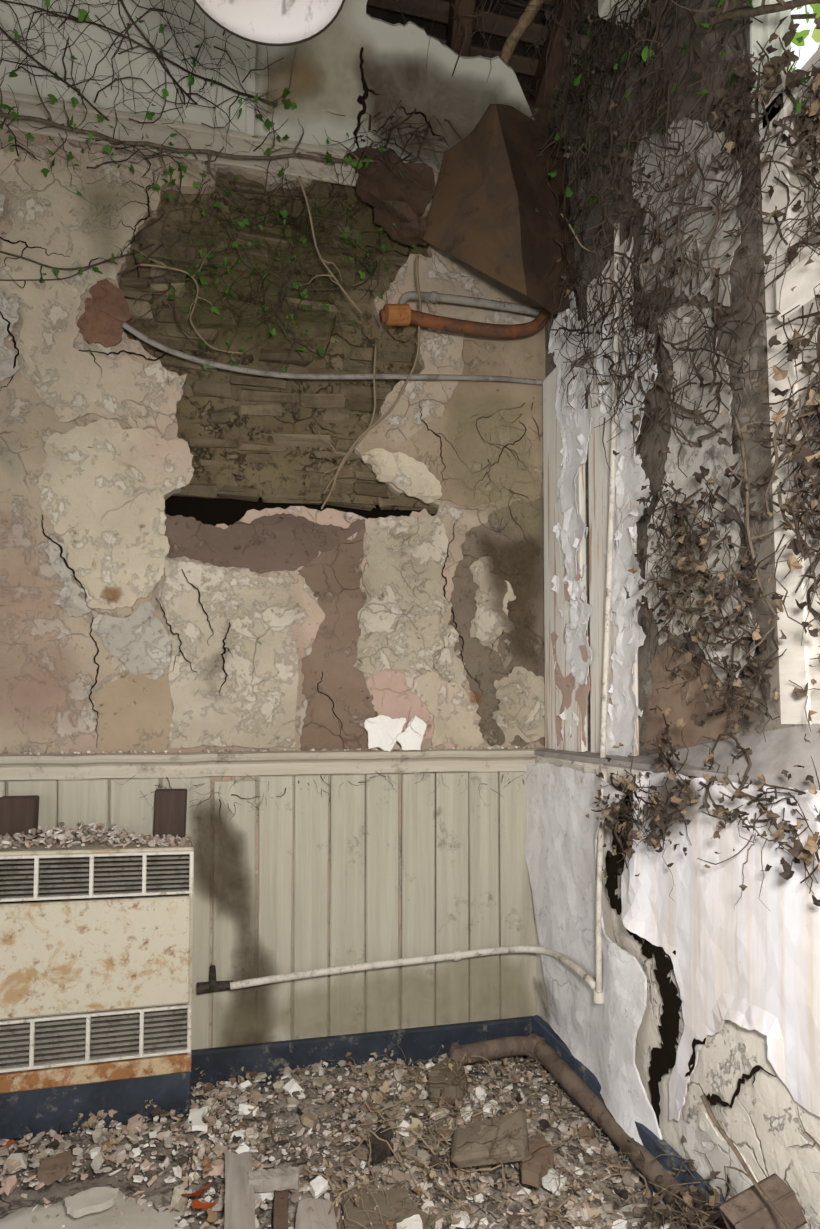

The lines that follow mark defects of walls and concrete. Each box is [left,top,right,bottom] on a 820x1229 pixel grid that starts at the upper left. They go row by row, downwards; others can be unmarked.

peeling [0,149,164,184]
peeling [0,289,21,382]
flaking render [70,116,760,757]
crack [41,514,100,738]
peeling [45,530,172,680]
crack [605,795,776,1129]
peeling [621,771,820,1121]
crack [787,1105,820,1148]